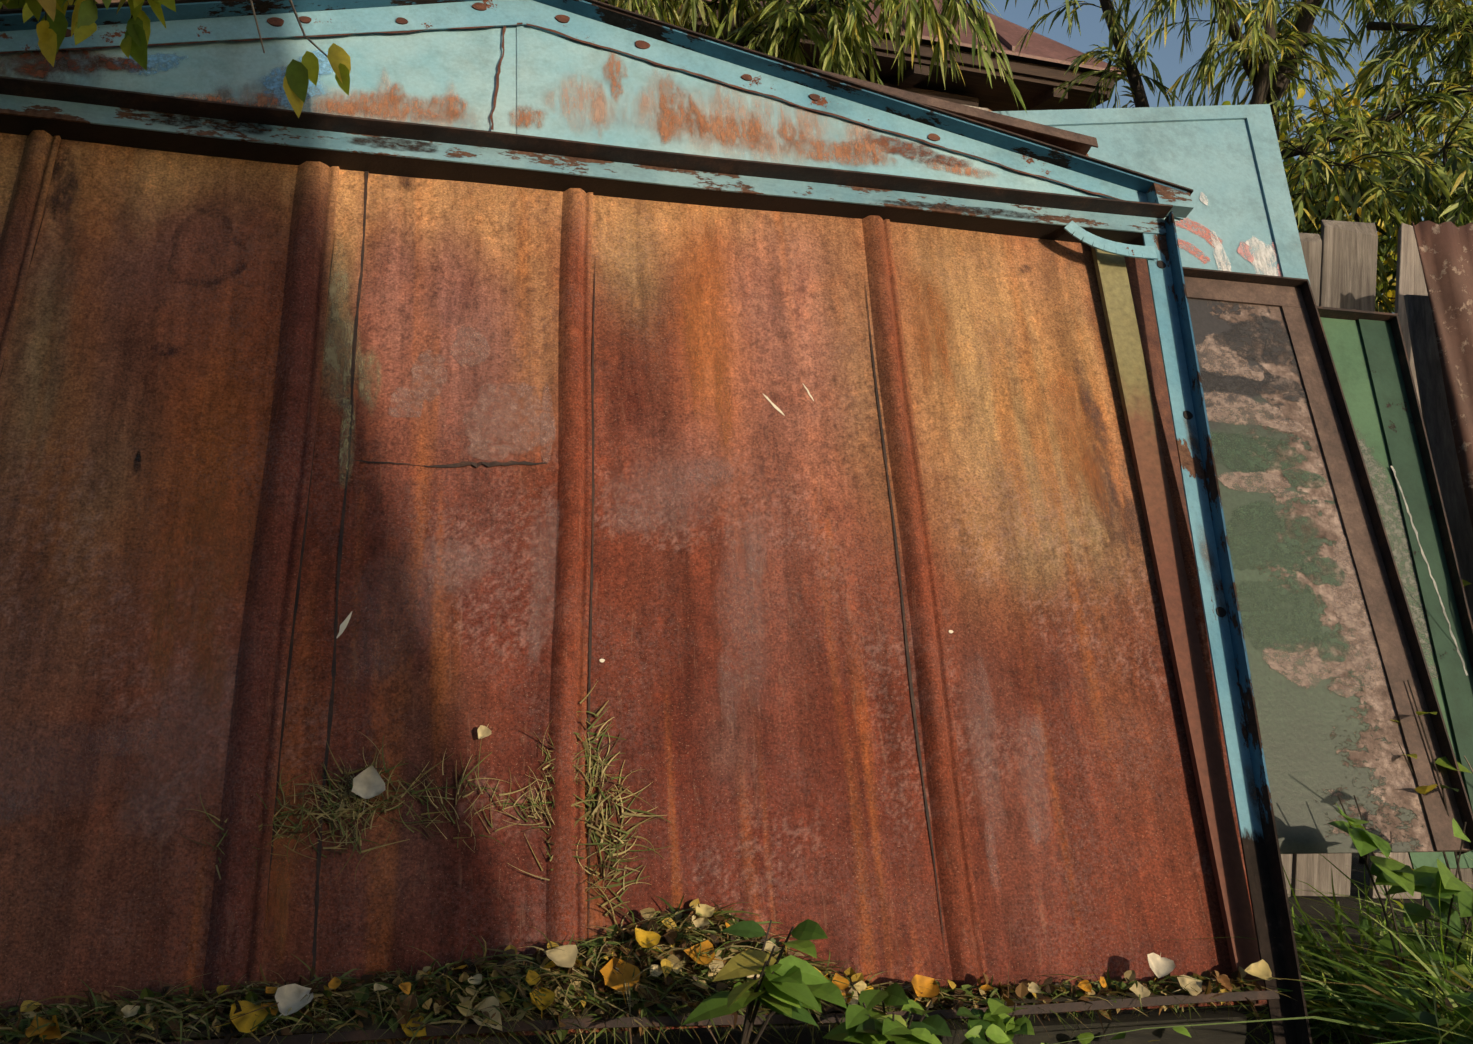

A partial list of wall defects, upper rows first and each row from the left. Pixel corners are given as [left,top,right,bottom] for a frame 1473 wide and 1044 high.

corrosion [605,54,623,98]
corrosion [321,84,466,119]
corrosion [512,109,541,127]
corrosion [660,82,978,176]
peeling [1218,469,1326,498]
peeling [1357,431,1468,678]
peeling [1262,537,1387,698]